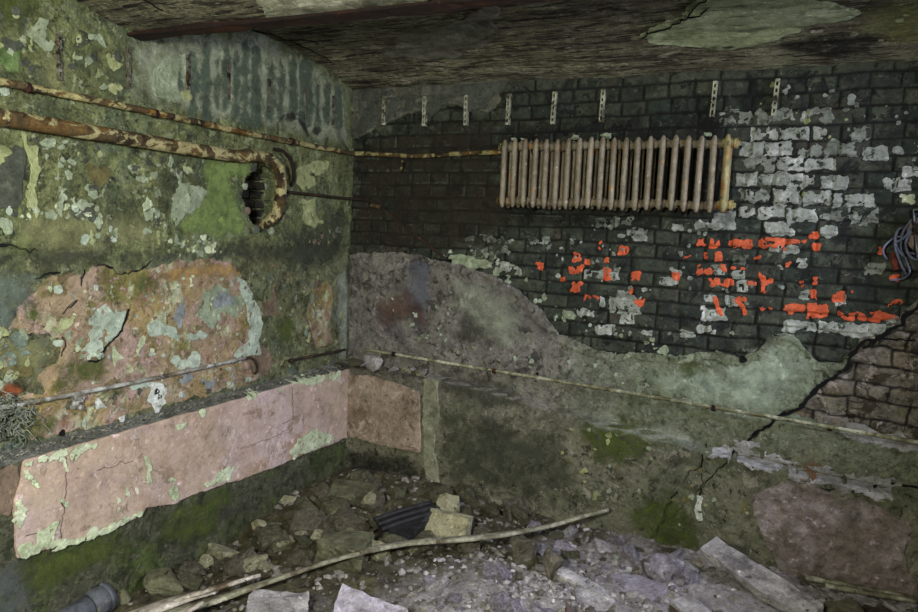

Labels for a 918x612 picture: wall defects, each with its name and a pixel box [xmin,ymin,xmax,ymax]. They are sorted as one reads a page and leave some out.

peeling [0,17,55,79]
peeling [67,33,123,95]
peeling [153,53,186,103]
peeling [640,0,870,51]
flaking render [0,129,118,245]
flaking render [279,61,918,439]
peeling [0,150,275,440]
peeling [0,443,98,529]
peeling [204,466,235,487]
peeling [289,428,335,460]
crack [650,304,918,539]
peeling [17,488,143,559]